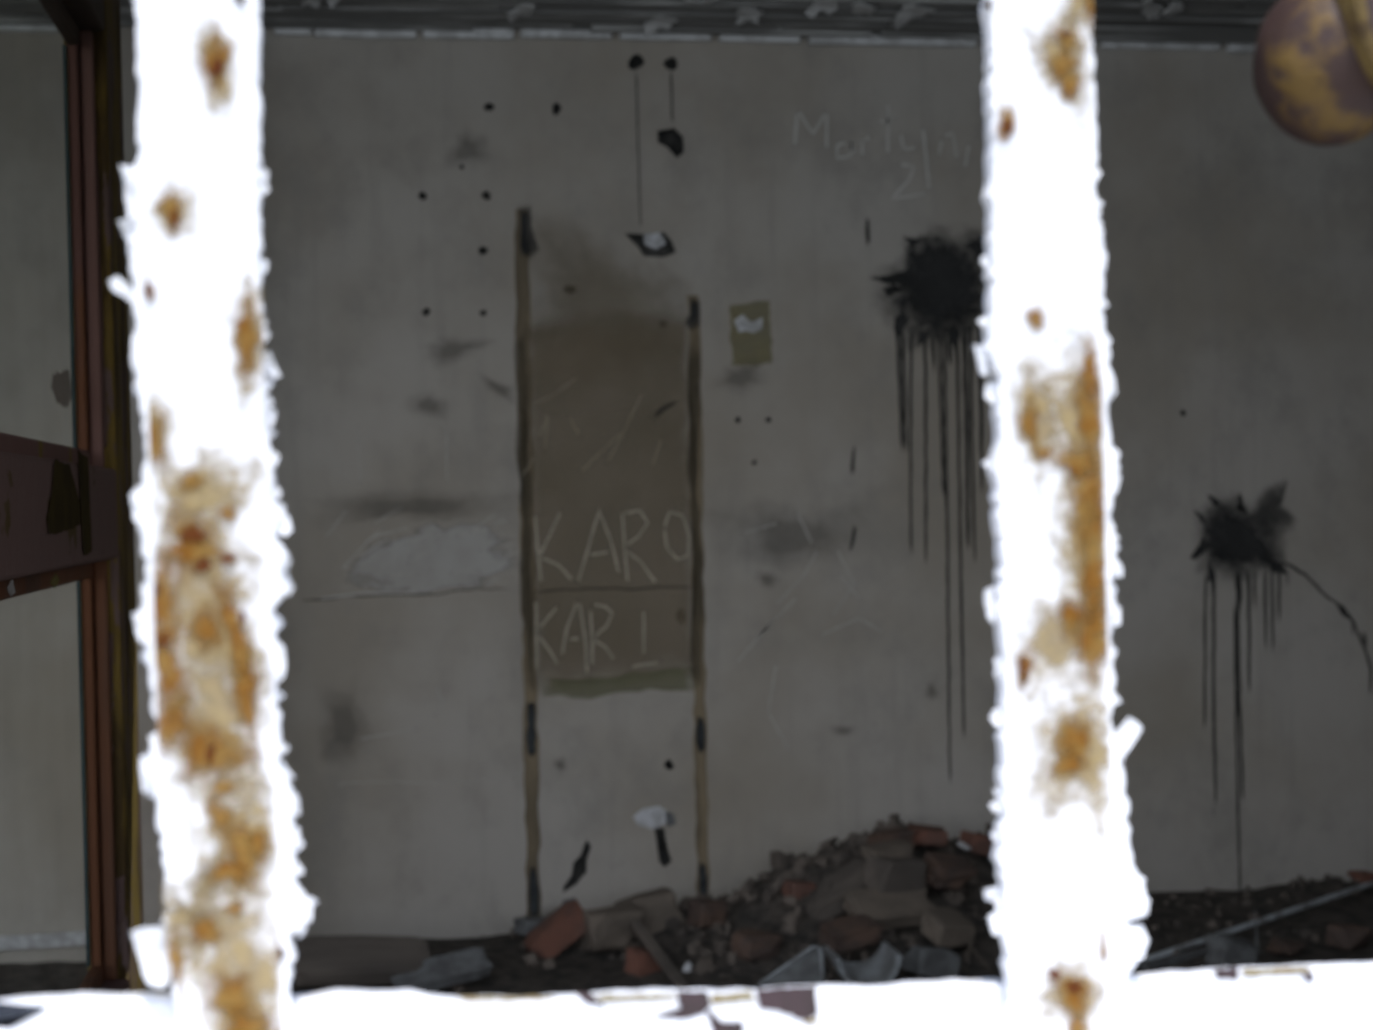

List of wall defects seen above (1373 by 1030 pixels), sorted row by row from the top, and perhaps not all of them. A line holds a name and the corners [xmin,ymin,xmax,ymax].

rust [199,31,232,108]
spalling [628,54,645,70]
spalling [663,57,678,70]
peeling [805,0,877,18]
rust [1036,0,1094,104]
peeling [1140,0,1184,21]
rust [233,279,264,394]
damp [873,236,986,781]
rust [1015,345,1110,834]
rust [148,400,285,1030]
damp [1190,487,1372,891]
peeling [0,1002,47,1030]